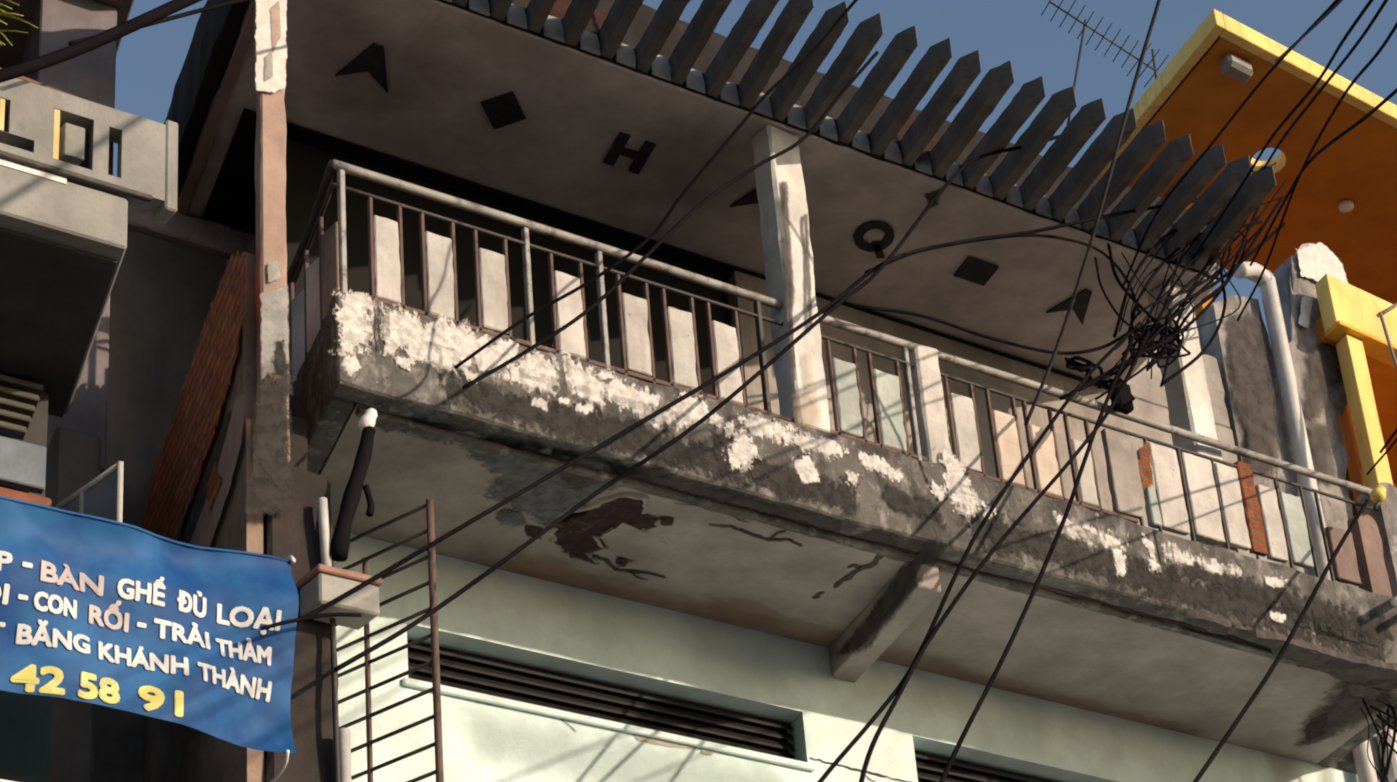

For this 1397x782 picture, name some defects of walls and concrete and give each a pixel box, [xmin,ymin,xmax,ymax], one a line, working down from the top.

spalling [524,492,674,567]
peeling [333,287,904,486]
leakage [369,369,898,547]
crack [674,428,802,547]
crack [812,555,884,599]
leakage [838,481,1395,662]
peeling [1053,511,1243,578]
peeling [1265,576,1288,588]
leakage [1305,342,1341,482]
leakage [1297,681,1396,746]